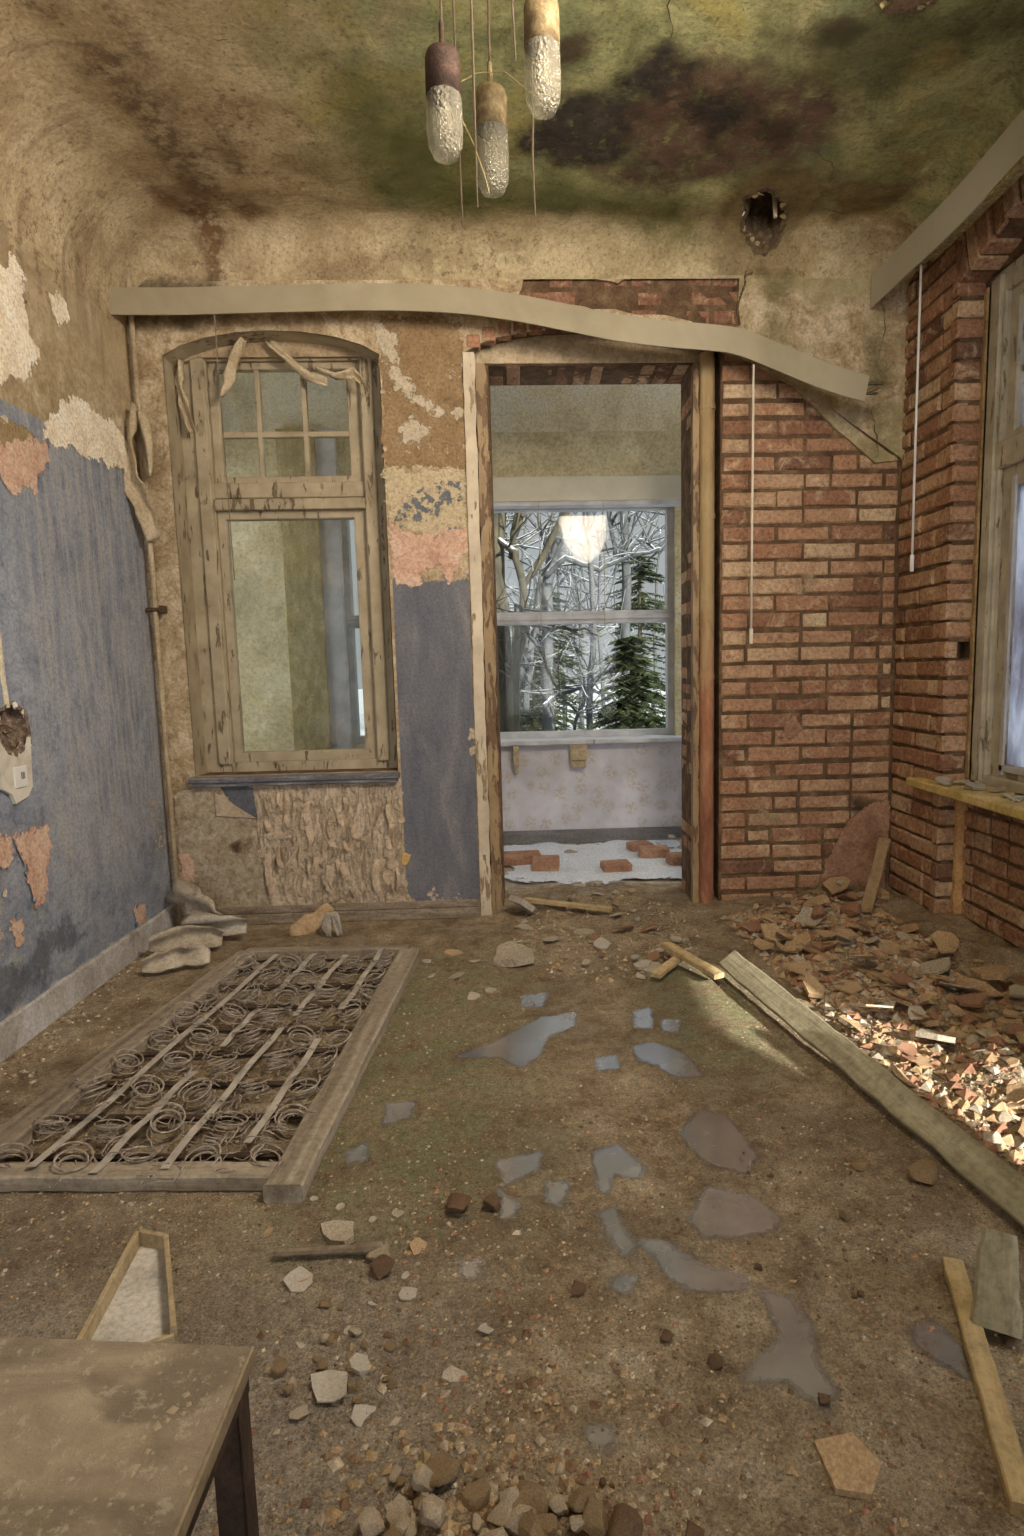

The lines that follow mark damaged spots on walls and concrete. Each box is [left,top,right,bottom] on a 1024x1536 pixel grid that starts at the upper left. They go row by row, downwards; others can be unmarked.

peeling [0,245,41,387]
peeling [48,290,70,327]
peeling [0,394,127,497]
spalling [0,701,32,757]
peeling [0,823,53,956]